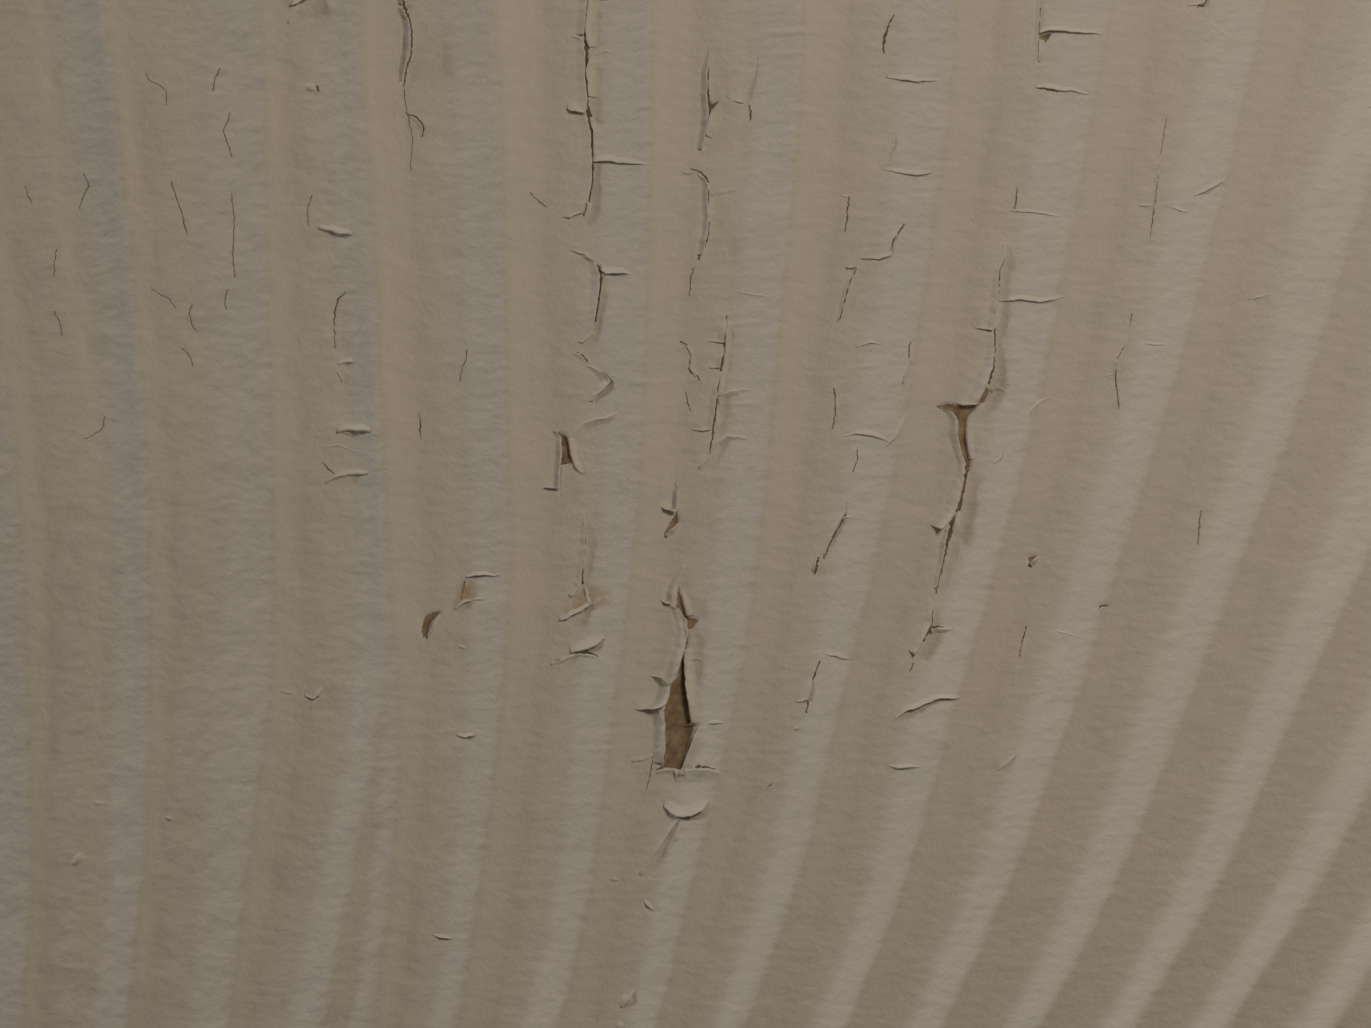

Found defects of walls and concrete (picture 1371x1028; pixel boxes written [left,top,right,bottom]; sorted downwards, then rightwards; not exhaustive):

peeling [422,611,441,637]
peeling [551,634,604,666]
peeling [632,565,724,789]